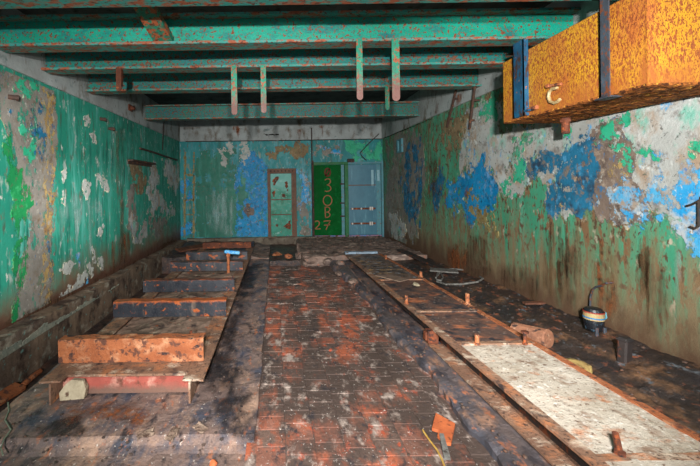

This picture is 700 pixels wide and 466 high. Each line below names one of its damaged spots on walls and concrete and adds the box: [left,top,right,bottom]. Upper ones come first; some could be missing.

peeling [0,70,104,320]
peeling [82,173,109,200]
peeling [126,158,197,244]
peeling [218,141,251,219]
peeling [265,141,343,236]
peeling [433,95,700,258]